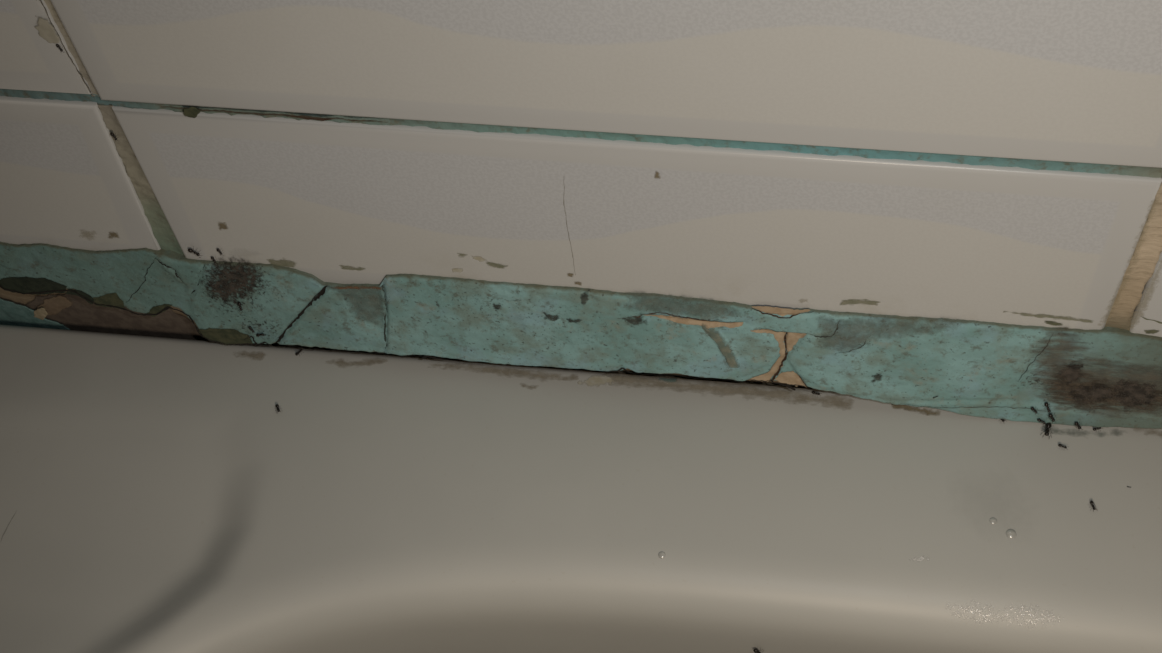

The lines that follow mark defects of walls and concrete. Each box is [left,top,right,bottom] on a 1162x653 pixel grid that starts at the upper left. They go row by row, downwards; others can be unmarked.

spalling [0,277,270,346]
water stain [201,259,279,337]
crack [276,285,866,392]
peeling [618,306,814,388]